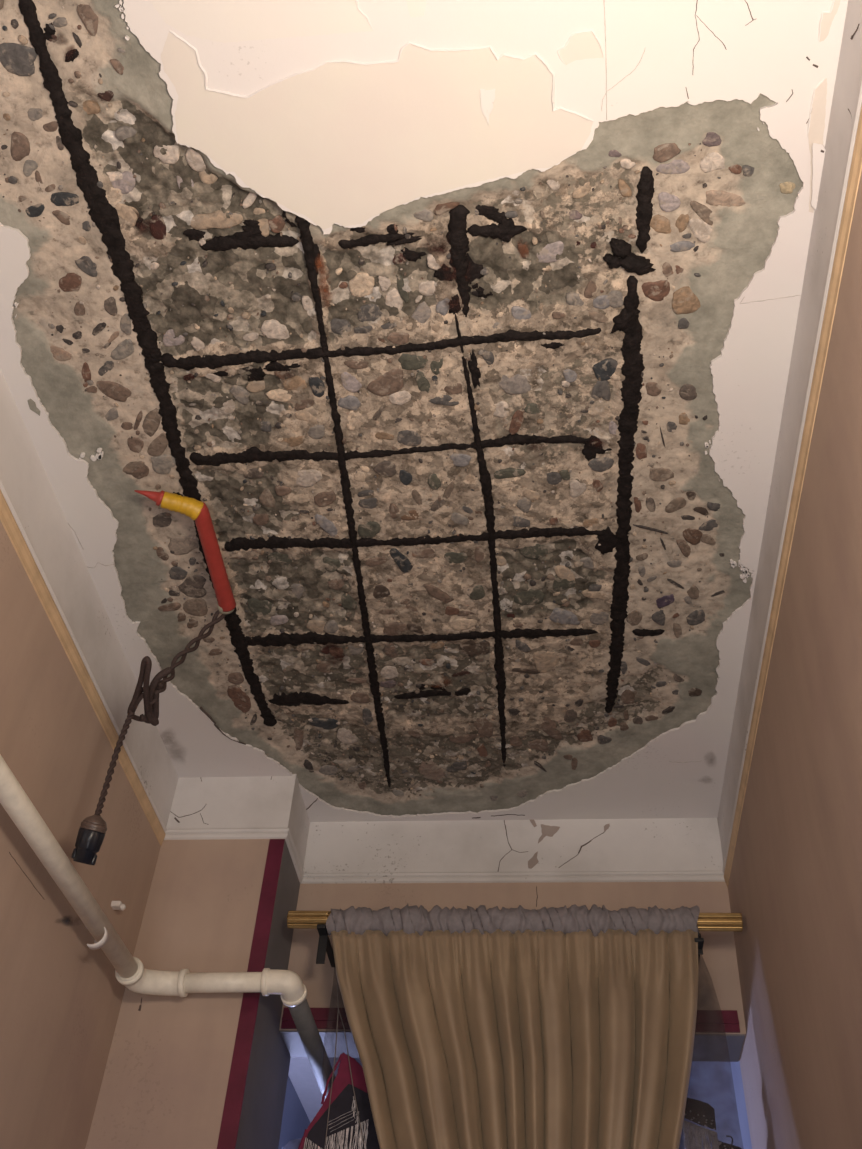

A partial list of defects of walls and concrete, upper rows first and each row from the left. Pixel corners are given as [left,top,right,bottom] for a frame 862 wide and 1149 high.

crack [602,5,645,120]
crack [686,0,727,99]
spalling [0,0,827,816]
crack [472,814,528,871]
peeling [528,820,560,869]
crack [559,825,610,868]